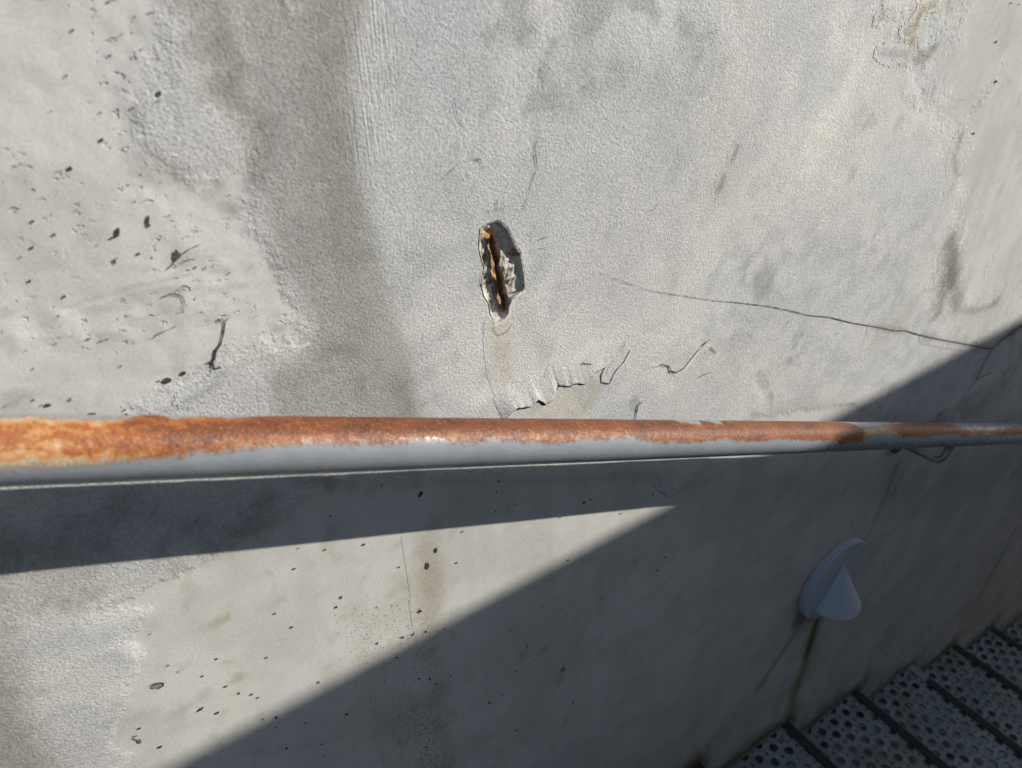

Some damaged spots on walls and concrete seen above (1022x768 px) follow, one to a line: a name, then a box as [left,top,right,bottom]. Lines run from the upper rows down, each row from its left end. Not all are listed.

spalling [479,221,525,336]
crack [206,317,229,370]
peeling [493,342,630,419]
peeling [645,340,716,377]
crack [602,274,1022,391]
leakage [800,616,823,664]